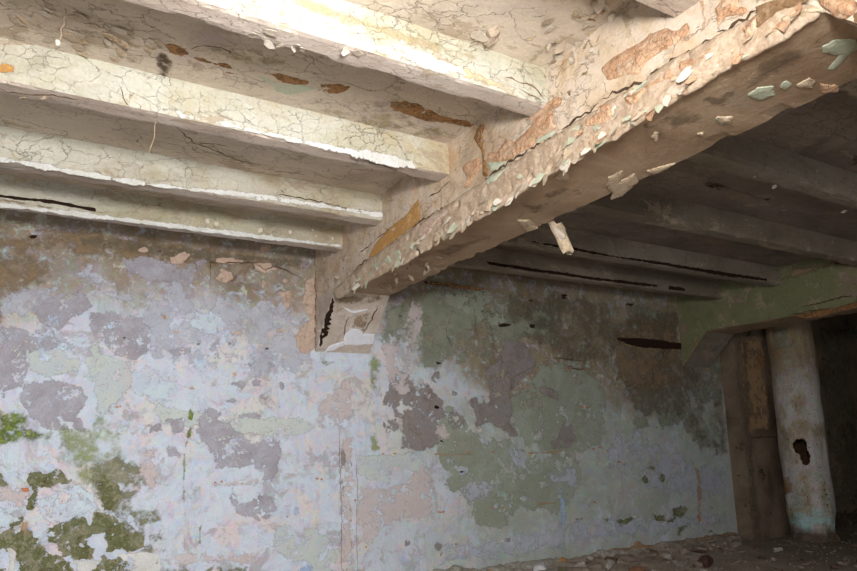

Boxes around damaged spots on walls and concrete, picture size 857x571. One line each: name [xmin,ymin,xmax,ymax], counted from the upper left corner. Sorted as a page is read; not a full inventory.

peeling [246,28,306,53]
crack [1,89,78,100]
crack [485,10,757,180]
spalling [0,195,341,247]
spalling [0,157,383,217]
spalling [333,0,857,313]
flaking render [123,256,207,287]
crack [209,258,377,347]
flaking render [0,290,151,431]
flaking render [323,301,536,453]
damp [386,288,727,454]
flaking render [196,408,282,481]